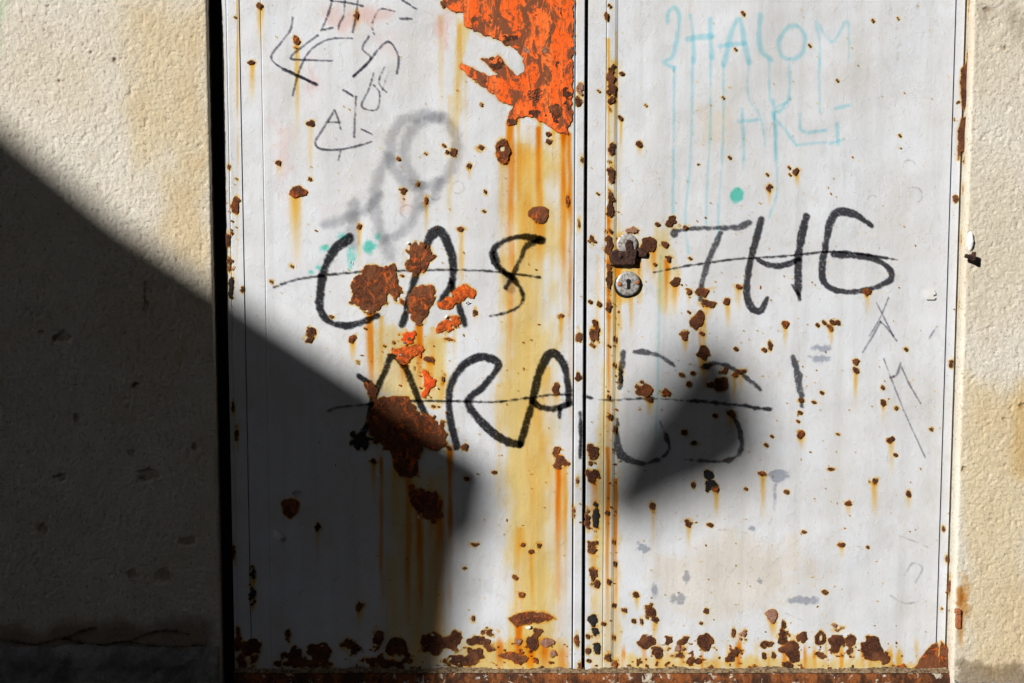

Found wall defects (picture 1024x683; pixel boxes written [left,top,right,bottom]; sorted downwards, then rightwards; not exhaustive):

peeling [440,0,575,135]
rust [597,64,624,120]
rust [953,52,968,163]
rust [478,138,510,164]
rust [528,206,548,224]
rust [669,275,745,392]
rust [552,142,706,588]
rust [796,382,823,439]
rust [683,469,718,493]
rust [233,626,262,668]
rust [269,591,949,669]